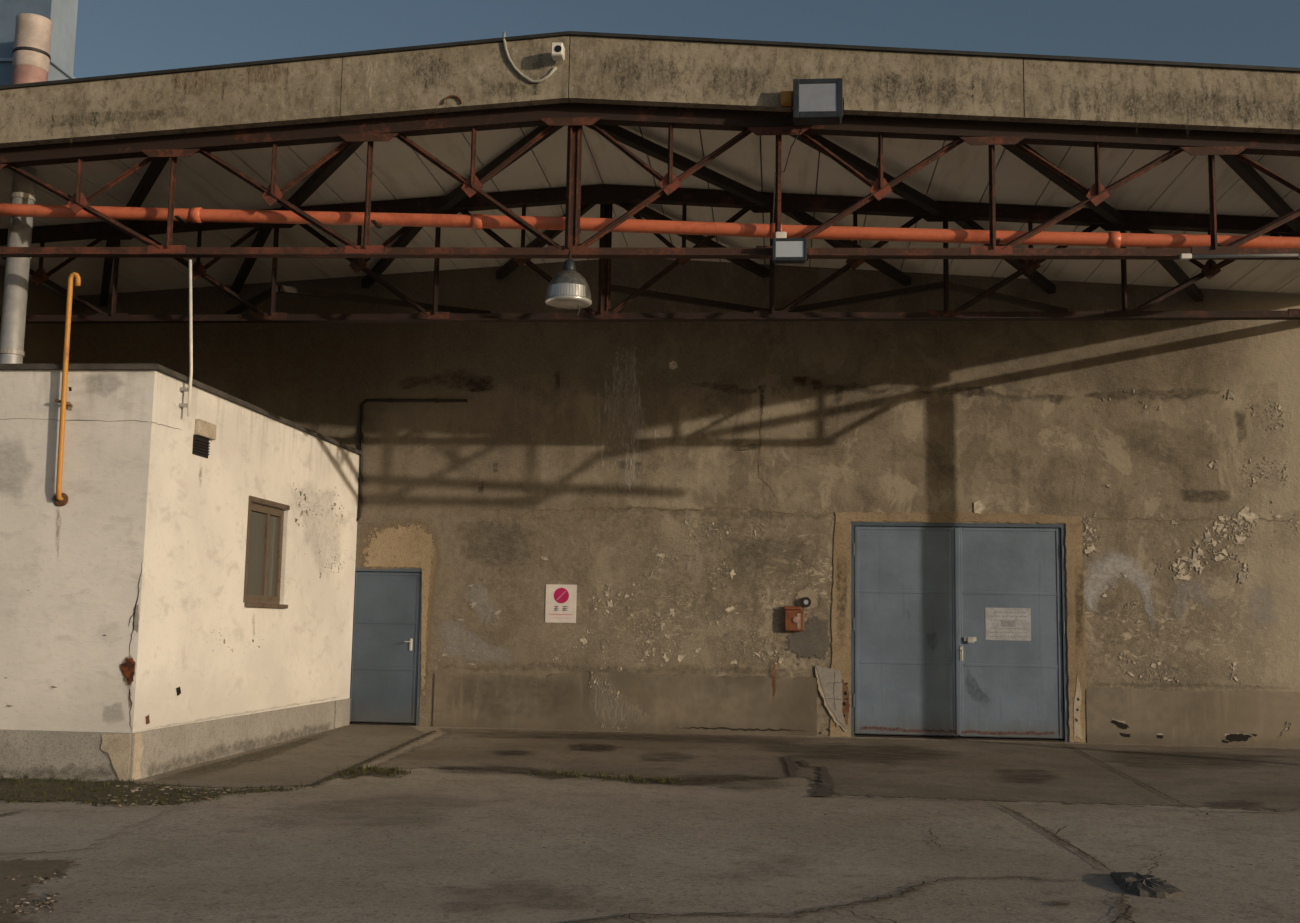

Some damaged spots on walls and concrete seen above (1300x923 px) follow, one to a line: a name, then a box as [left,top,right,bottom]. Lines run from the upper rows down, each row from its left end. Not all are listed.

peeling [293,483,344,578]
peeling [1155,501,1299,586]
crack [128,563,142,657]
flaking render [359,522,484,707]
spalling [815,665,850,734]
spalling [1111,718,1131,737]
spalling [1222,732,1257,743]
crack [564,825,1169,923]